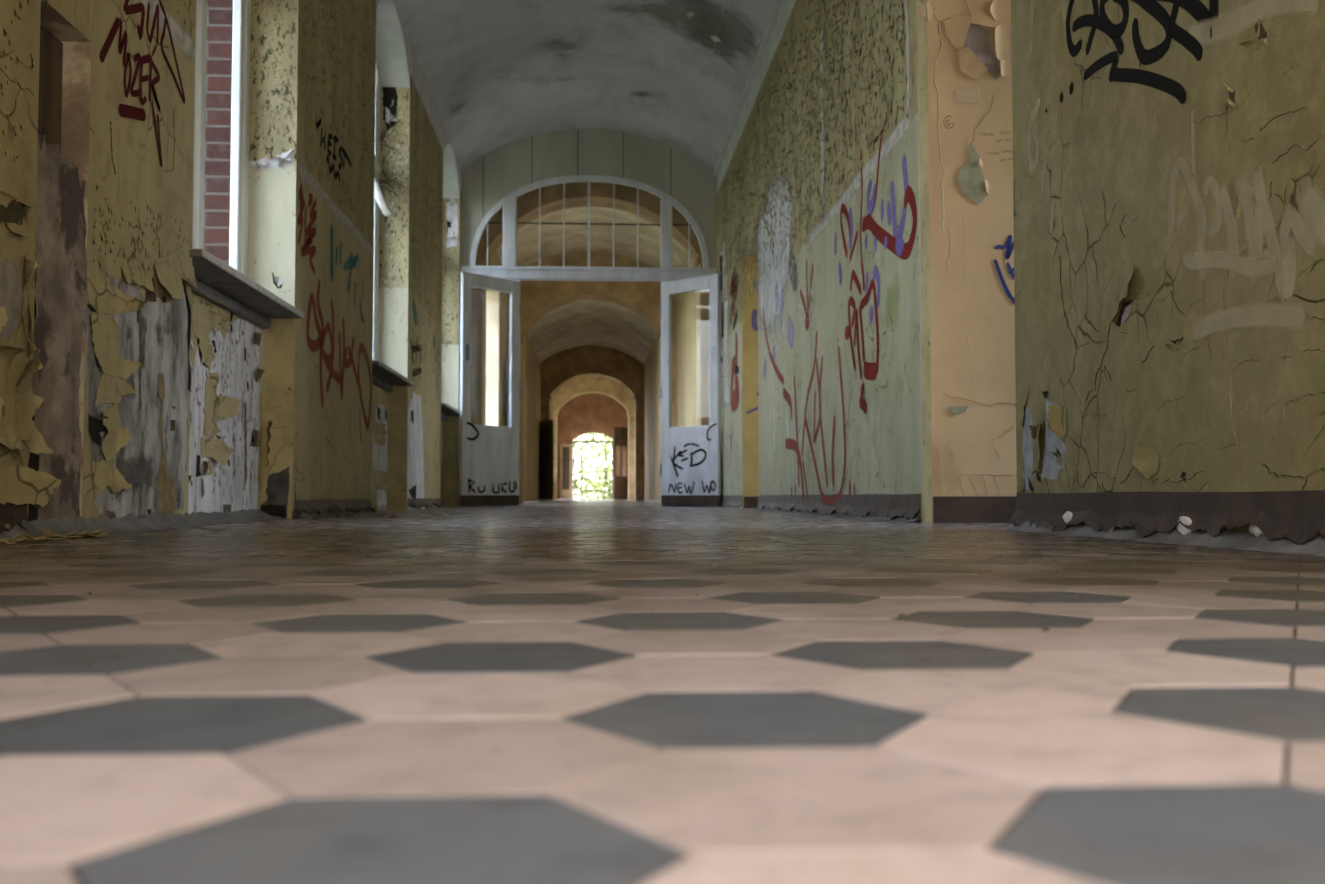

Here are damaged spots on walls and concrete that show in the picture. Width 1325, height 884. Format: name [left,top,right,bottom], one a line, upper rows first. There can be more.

crack [0,52,44,160]
peeling [0,191,61,521]
peeling [83,184,290,519]
water stain [642,0,751,58]
peeling [719,0,1010,476]
peeling [1015,386,1067,493]
crack [1059,236,1325,492]
crack [1191,95,1325,206]